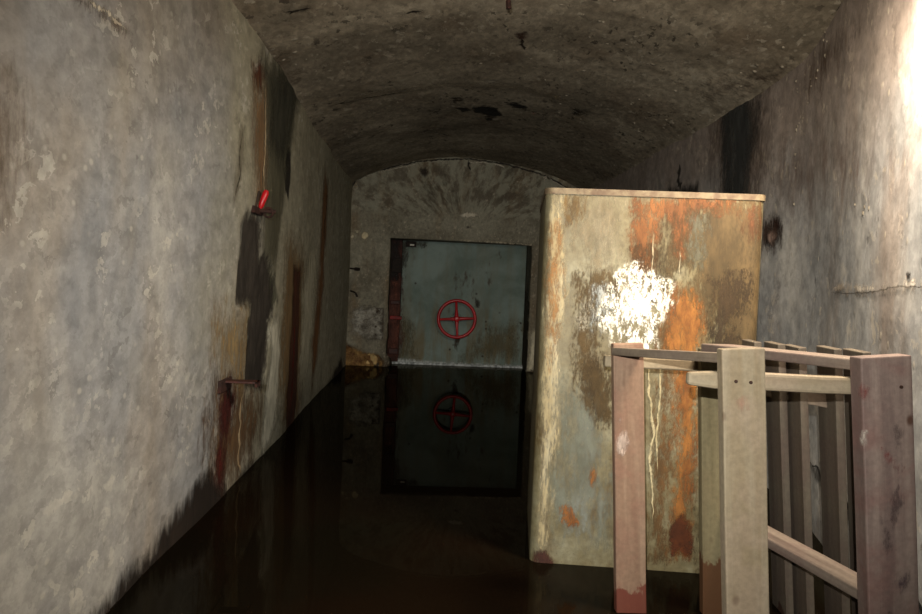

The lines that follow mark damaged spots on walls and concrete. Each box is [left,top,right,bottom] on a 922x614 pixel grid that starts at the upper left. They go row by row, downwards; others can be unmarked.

damp [717,99,764,194]
rust [546,195,626,431]
peeling [577,260,674,349]
rust [626,197,763,351]
crack [833,285,922,294]
rust [202,372,265,497]
rust [559,505,579,527]
rust [646,369,699,574]